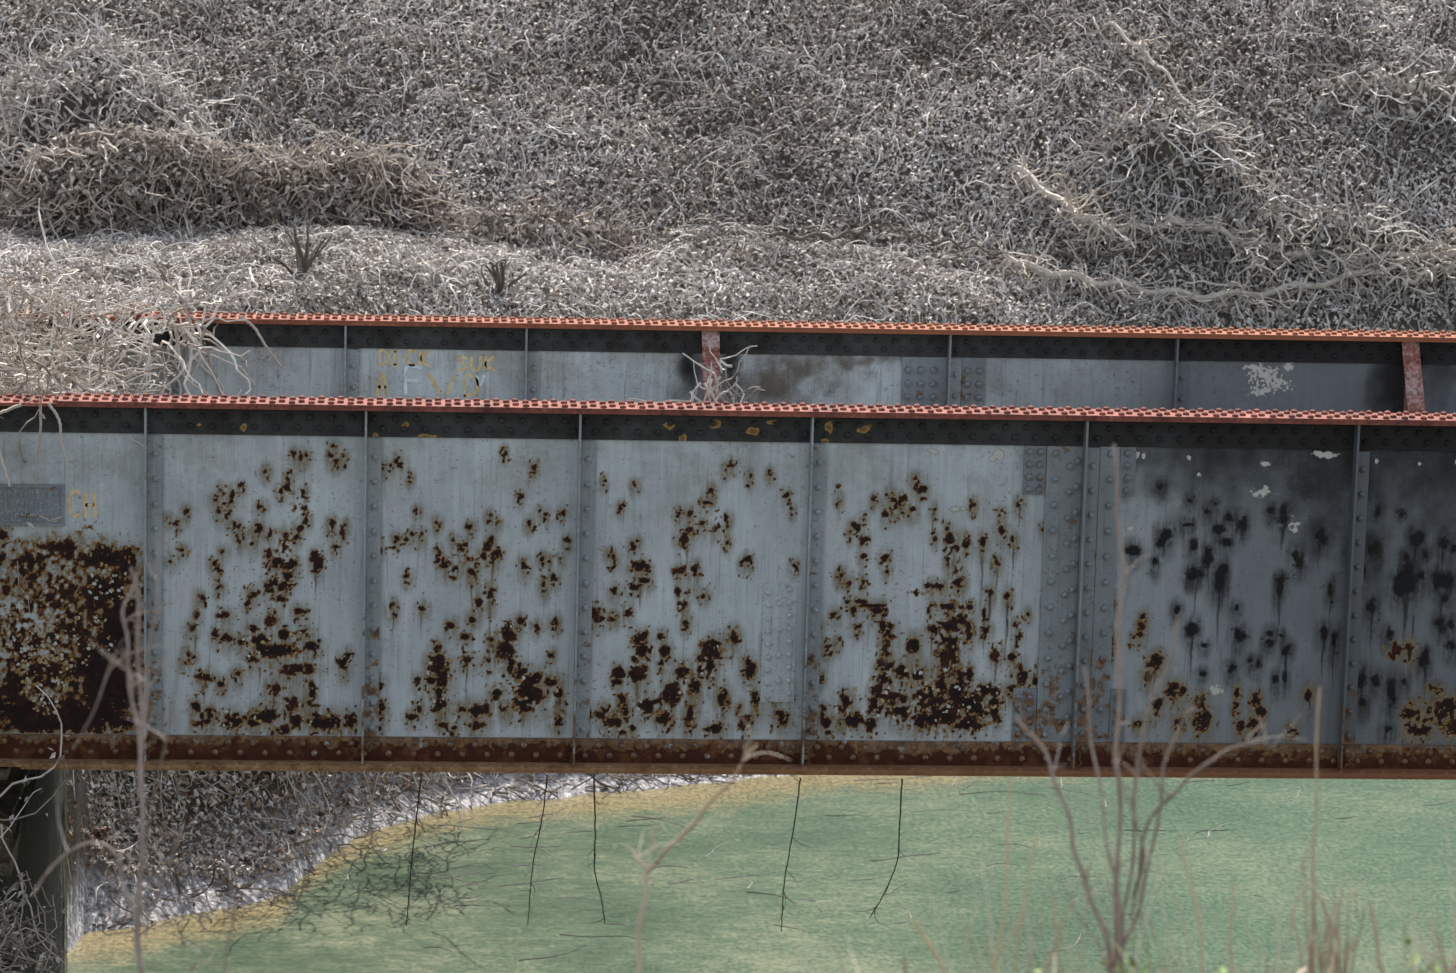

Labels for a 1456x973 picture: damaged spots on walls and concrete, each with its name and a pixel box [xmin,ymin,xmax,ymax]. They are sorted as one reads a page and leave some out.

corrosion [0,441,1456,769]